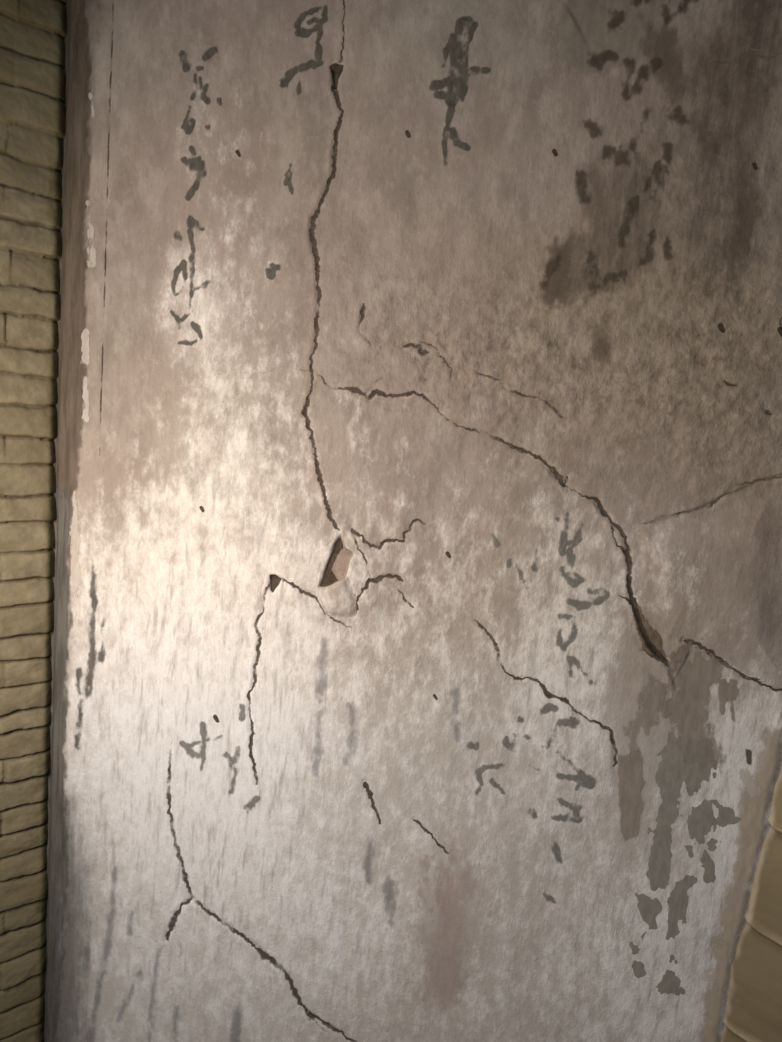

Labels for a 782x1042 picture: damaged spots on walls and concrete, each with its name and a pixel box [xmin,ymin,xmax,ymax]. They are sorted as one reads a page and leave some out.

crack [247,0,638,785]
flaking render [319,536,353,587]
crack [642,638,782,692]
crack [363,781,381,824]
peeling [618,597,741,978]
crack [166,764,357,1042]
peeling [657,955,685,996]